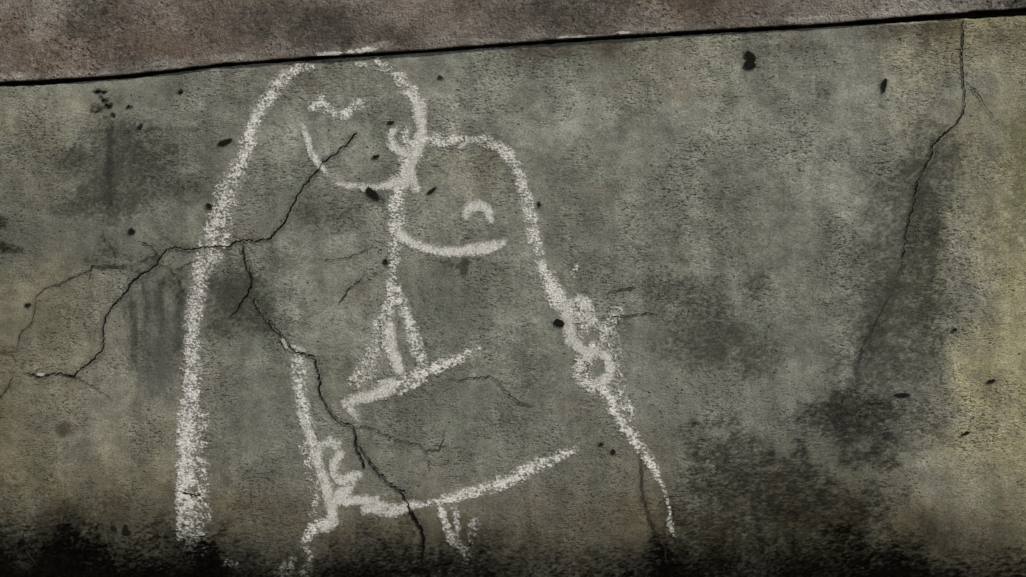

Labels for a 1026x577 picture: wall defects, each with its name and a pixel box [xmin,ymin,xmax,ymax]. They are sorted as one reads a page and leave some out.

crack [902,20,999,257]
crack [0,133,447,565]
crack [856,298,889,374]
water stain [0,387,1026,577]